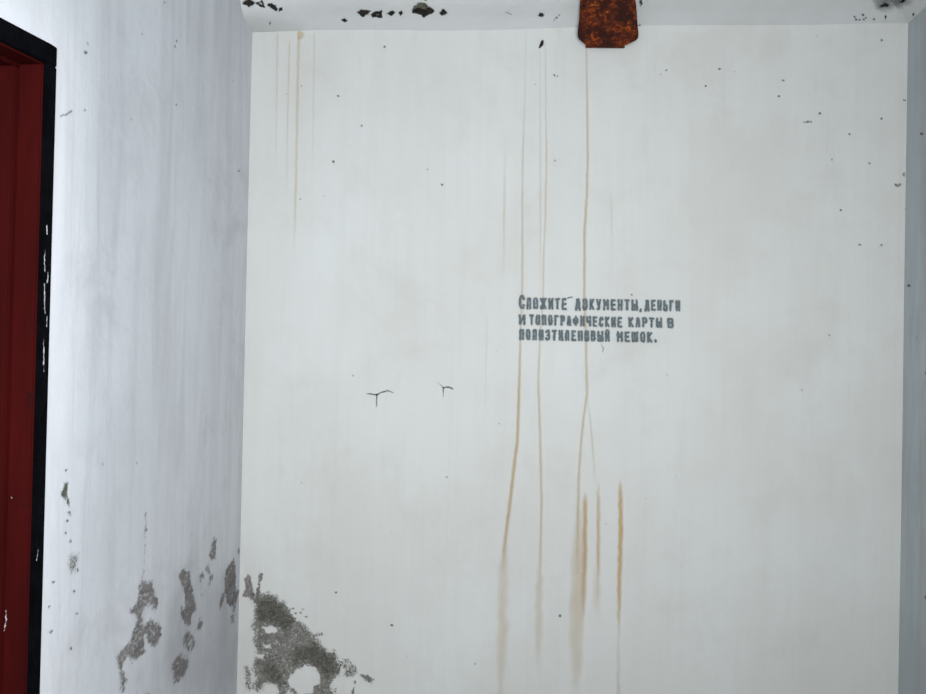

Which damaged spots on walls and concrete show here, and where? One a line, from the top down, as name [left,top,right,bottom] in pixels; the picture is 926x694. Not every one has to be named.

peeling [243,573,372,694]